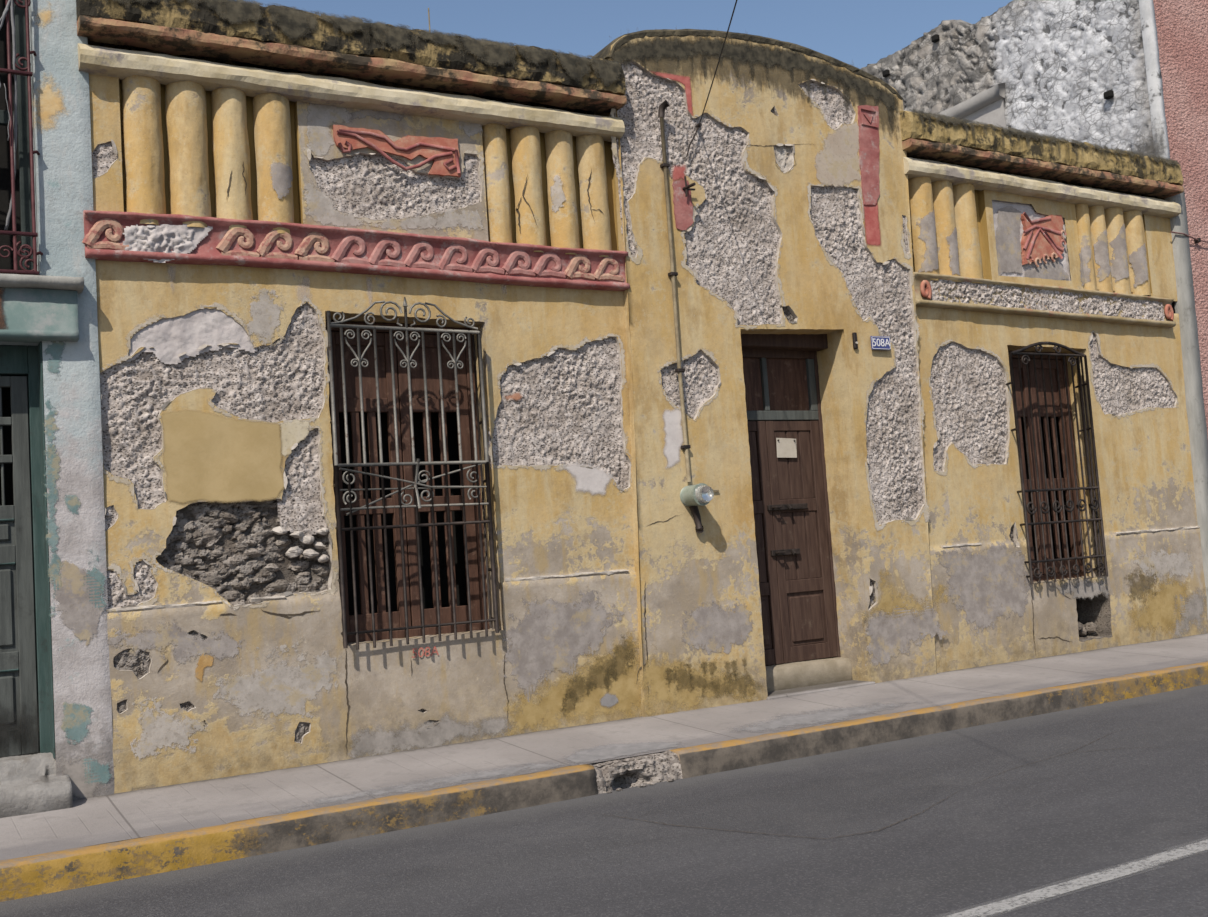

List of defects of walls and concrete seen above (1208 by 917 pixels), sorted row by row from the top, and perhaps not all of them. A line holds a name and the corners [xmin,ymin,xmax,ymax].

spalling [270,103,484,230]
crack [516,174,537,234]
crack [587,169,603,219]
spalling [610,60,798,330]
spalling [799,79,1178,531]
spalling [488,333,632,494]
spalling [657,348,721,468]
spalling [43,288,345,744]
water stain [350,636,762,758]
spalling [579,749,683,794]